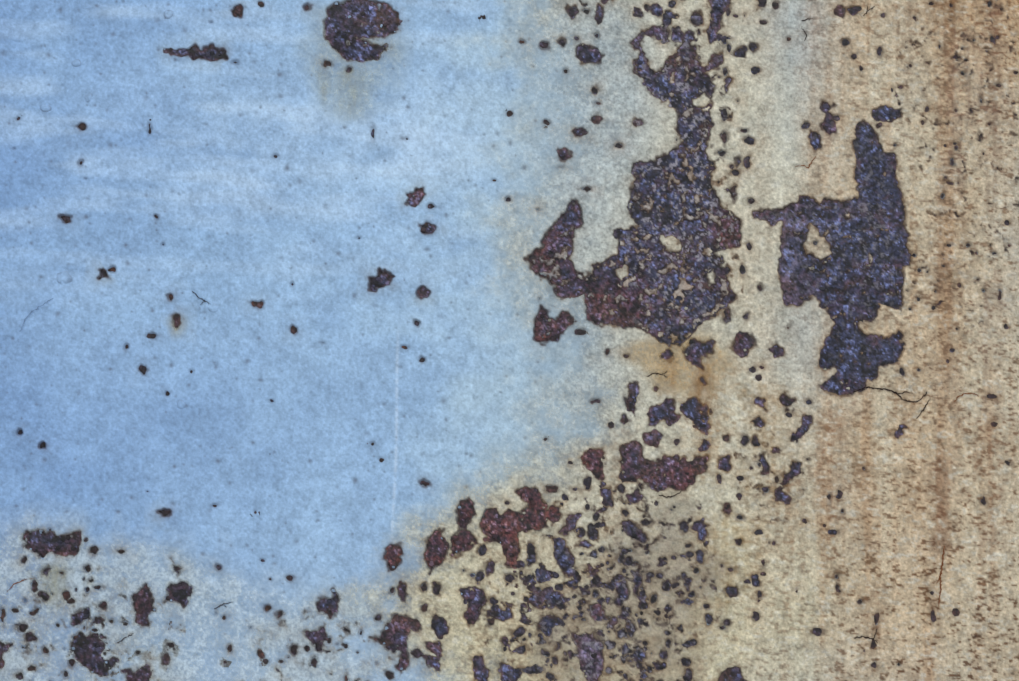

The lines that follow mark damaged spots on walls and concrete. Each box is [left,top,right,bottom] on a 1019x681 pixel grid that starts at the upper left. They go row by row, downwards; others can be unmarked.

peeling [525,0,741,370]
corrosion [338,0,1019,681]
peeling [733,331,754,358]
peeling [753,102,912,395]
corrosion [0,535,394,681]